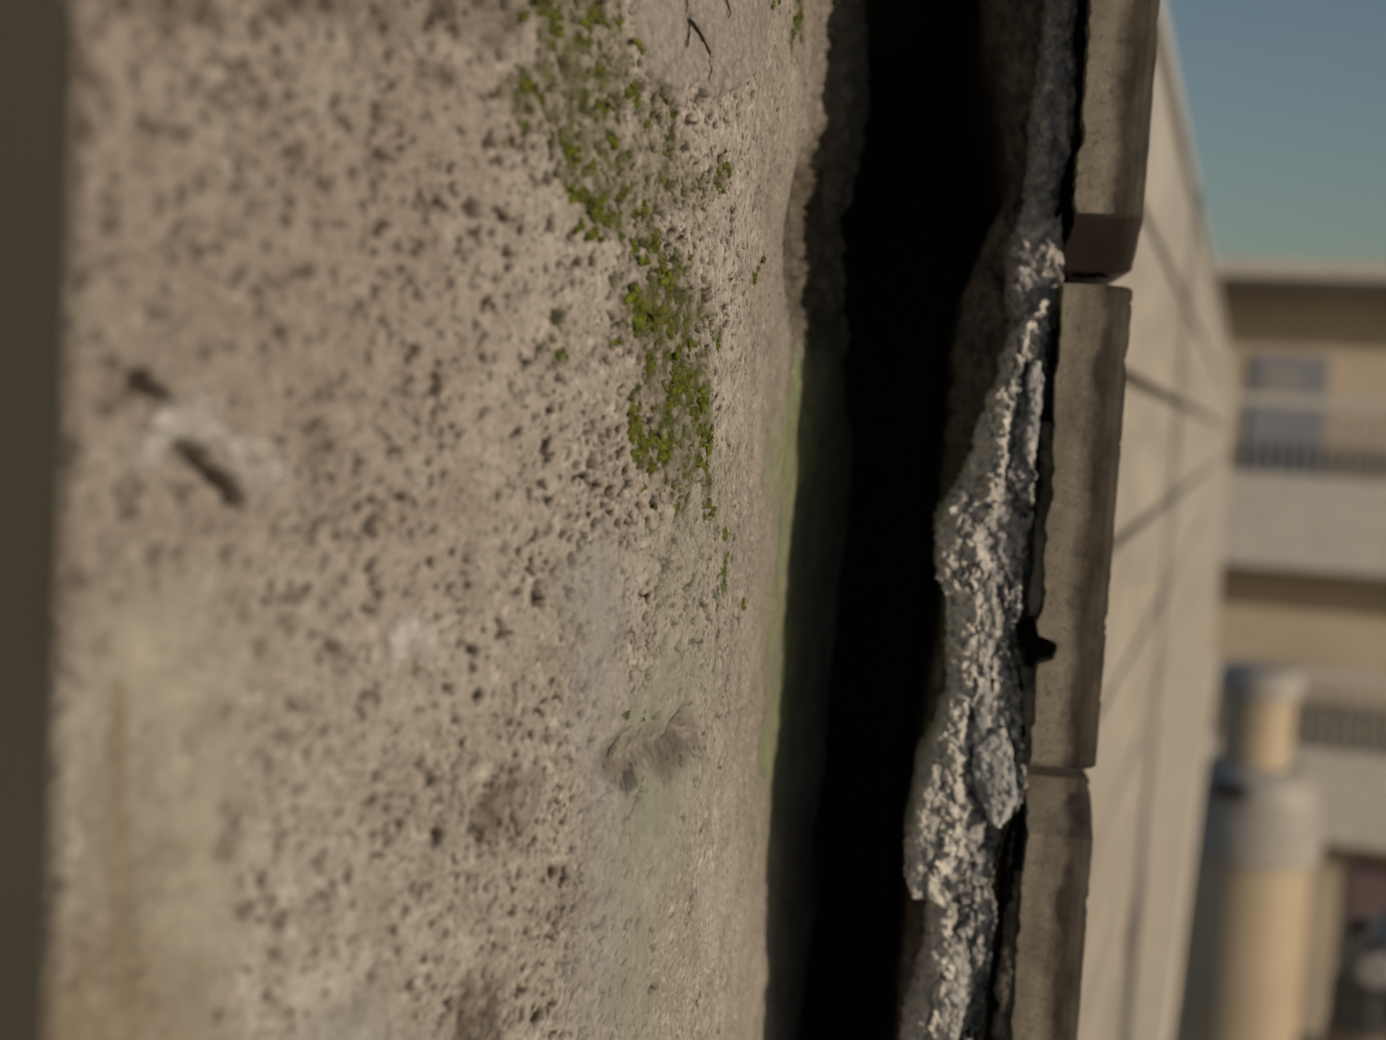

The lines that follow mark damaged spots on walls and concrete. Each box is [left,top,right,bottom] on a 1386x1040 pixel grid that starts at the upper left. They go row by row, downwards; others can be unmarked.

crack [685,0,731,81]
spalling [898,298,1055,1040]
crack [980,803,1021,1040]